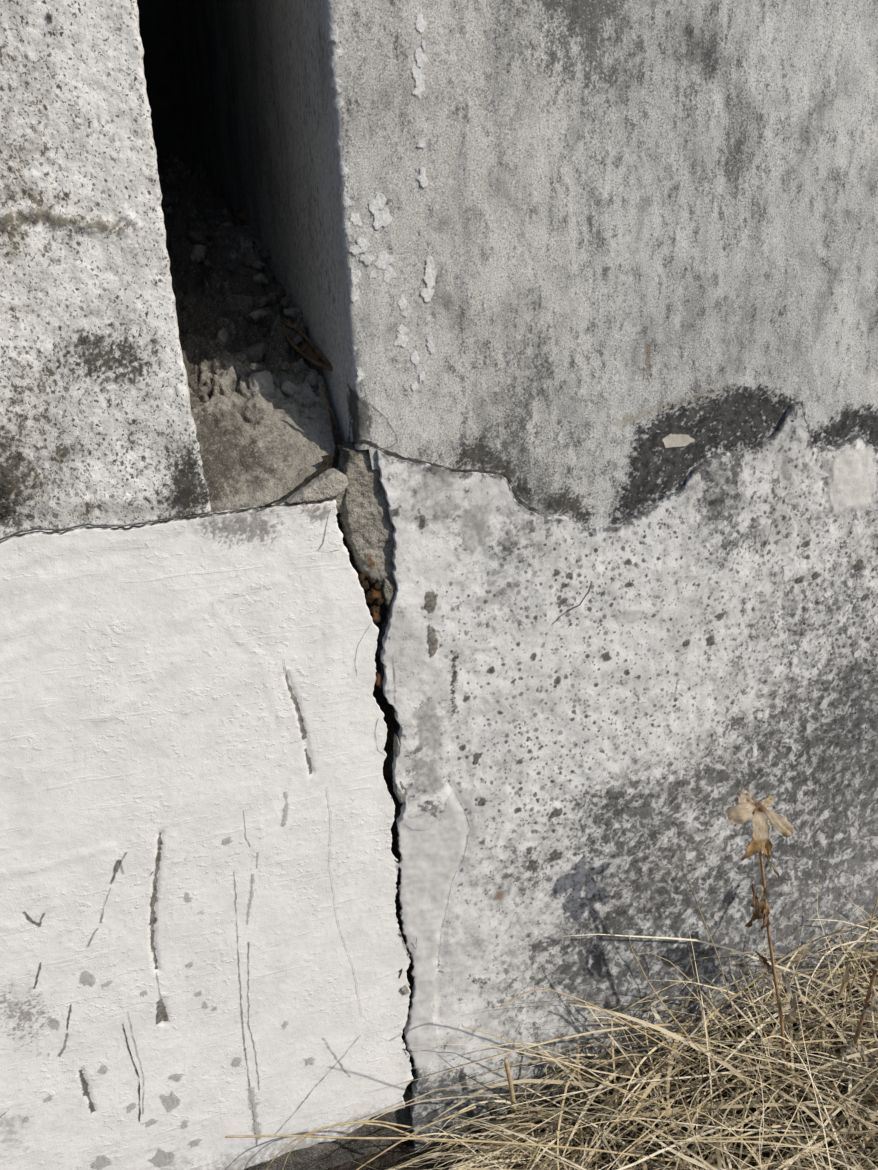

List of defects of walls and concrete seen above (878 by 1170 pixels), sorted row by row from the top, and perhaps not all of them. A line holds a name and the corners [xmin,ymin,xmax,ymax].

peeling [327,0,344,111]
peeling [411,14,428,98]
peeling [335,139,397,302]
peeling [421,256,438,302]
peeling [394,294,435,393]
damp [0,431,43,535]
spalling [286,344,400,586]
peeling [414,473,490,553]
damp [457,436,595,527]
damp [609,382,878,525]
crack [0,381,544,1093]
crack [123,1013,144,1122]